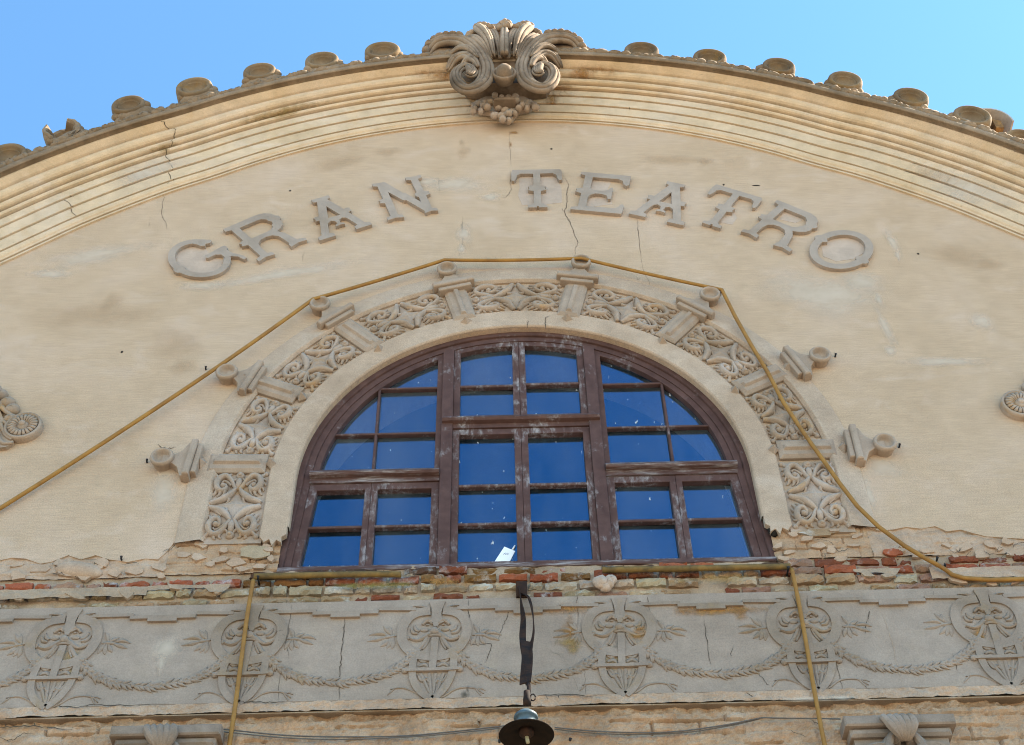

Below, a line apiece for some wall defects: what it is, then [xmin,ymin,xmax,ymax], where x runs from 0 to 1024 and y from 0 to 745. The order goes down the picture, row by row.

crack [161,121,176,228]
flaking render [0,540,281,602]
flaking render [771,525,1024,562]